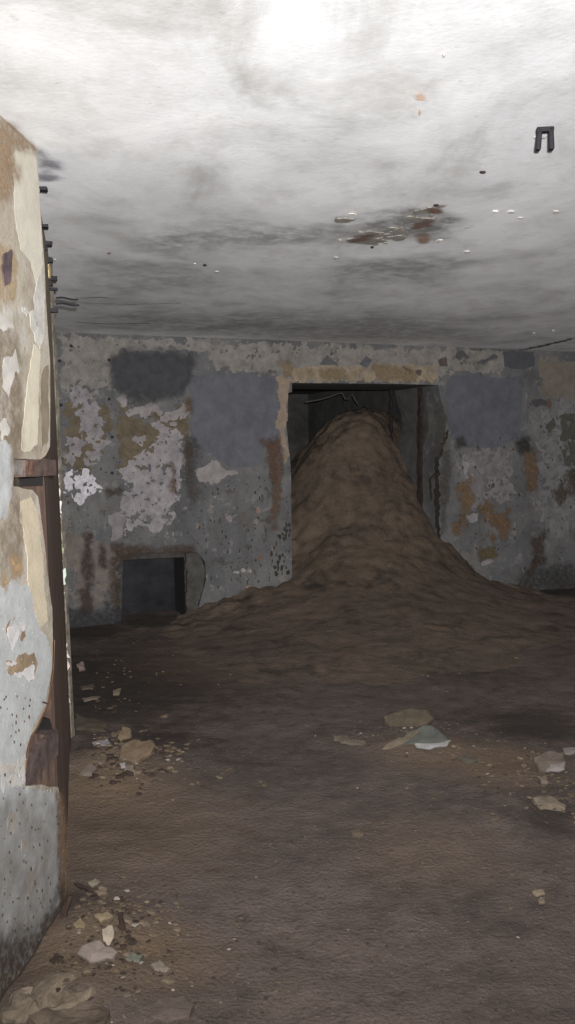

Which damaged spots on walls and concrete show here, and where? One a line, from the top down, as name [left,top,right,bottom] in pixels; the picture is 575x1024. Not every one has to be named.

corrosion [413,206,442,243]
flaking render [0,148,505,613]
corrosion [261,438,283,530]
crack [428,430,448,538]
corrosion [452,478,510,560]
flaking render [456,437,520,549]
flaking render [531,356,575,539]
peeling [6,497,48,682]
peeling [0,695,61,932]